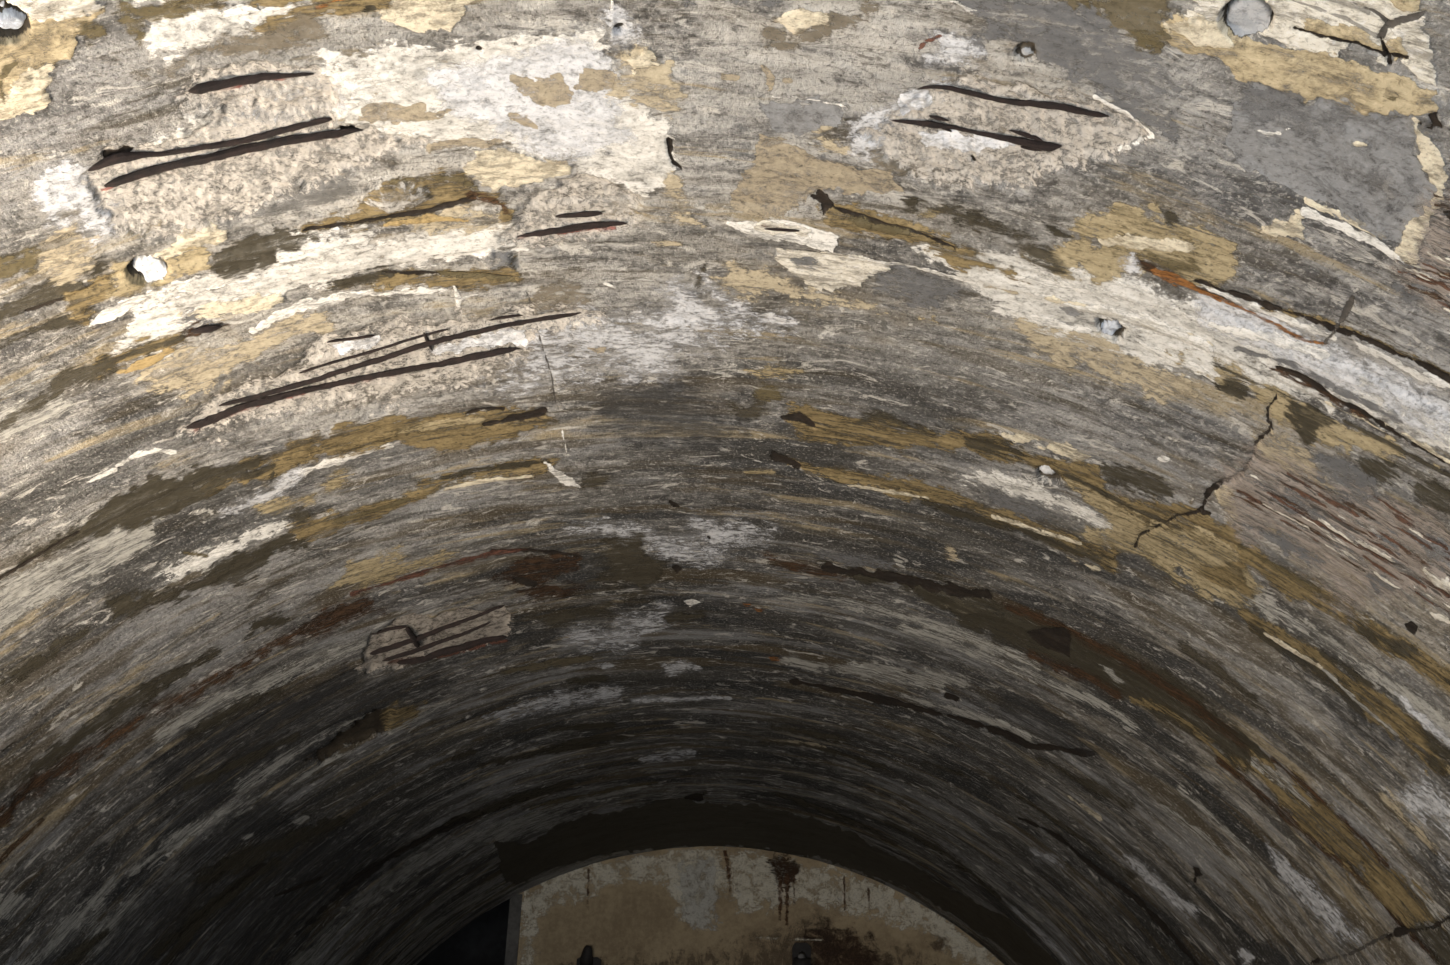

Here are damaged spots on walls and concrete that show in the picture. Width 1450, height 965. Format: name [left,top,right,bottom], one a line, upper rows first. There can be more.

crack [1293,2,1442,130]
spalling [0,0,707,486]
peeling [695,0,1450,453]
crack [1194,279,1450,384]
crack [1134,365,1450,548]
corrosion [0,548,585,864]
crack [1311,915,1450,965]